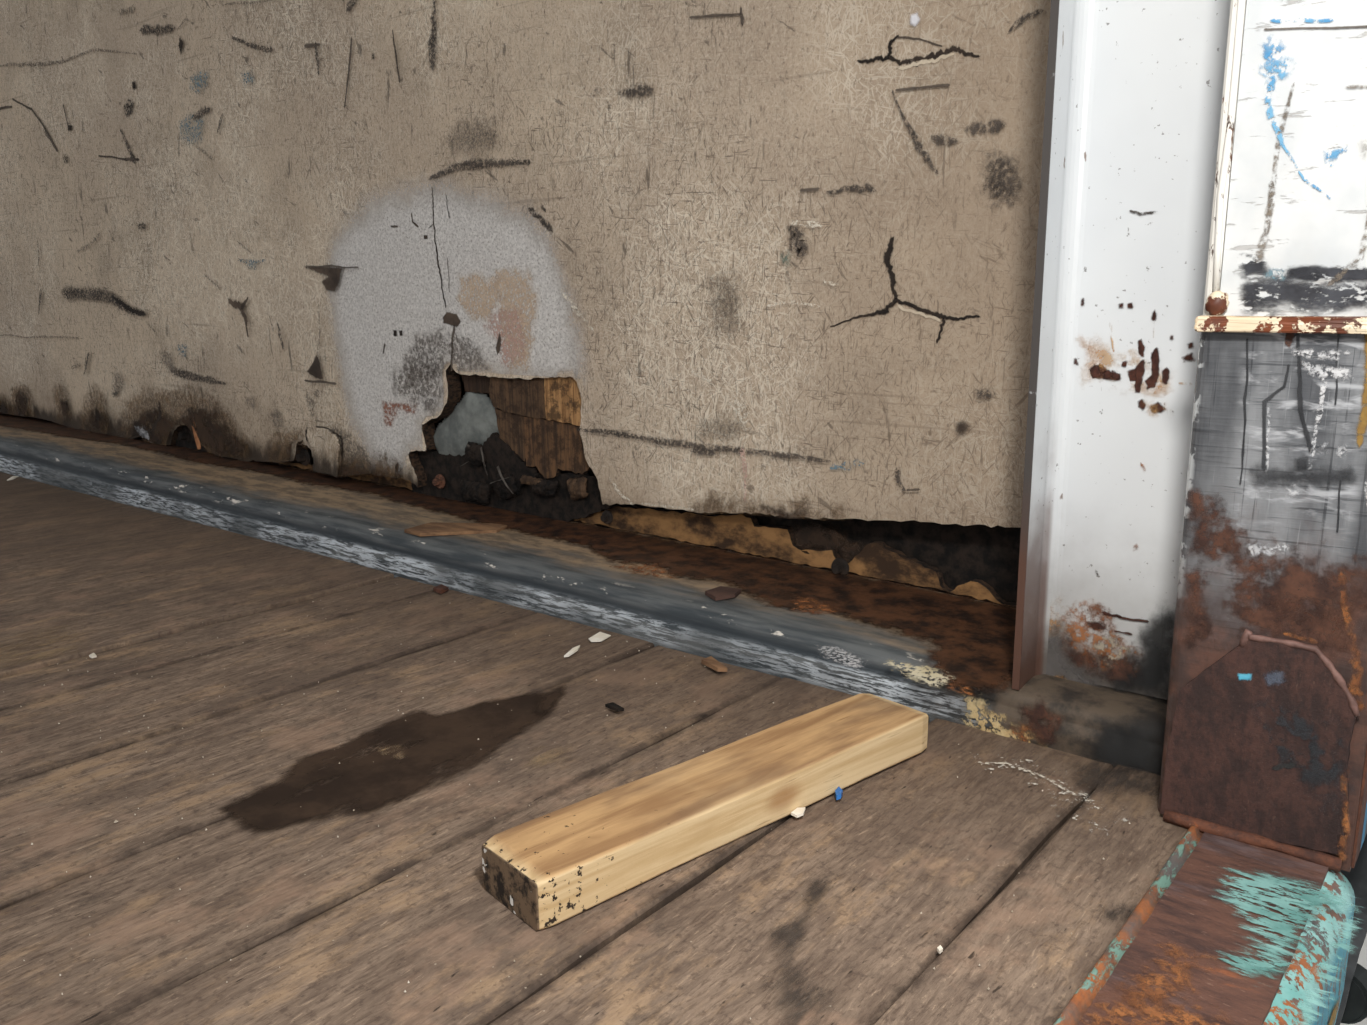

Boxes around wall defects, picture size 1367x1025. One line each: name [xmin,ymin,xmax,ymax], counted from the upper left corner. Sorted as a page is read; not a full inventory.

crack [857,35,980,70]
crack [830,237,980,343]
damp [0,385,34,416]
damp [53,344,248,457]
corrosion [1074,336,1195,413]
corrosion [0,413,1016,695]
corrosion [1046,571,1211,694]
corrosion [1187,490,1367,710]
damp [222,685,564,831]
corrosion [1339,776,1349,860]
corrosion [1094,944,1220,1025]